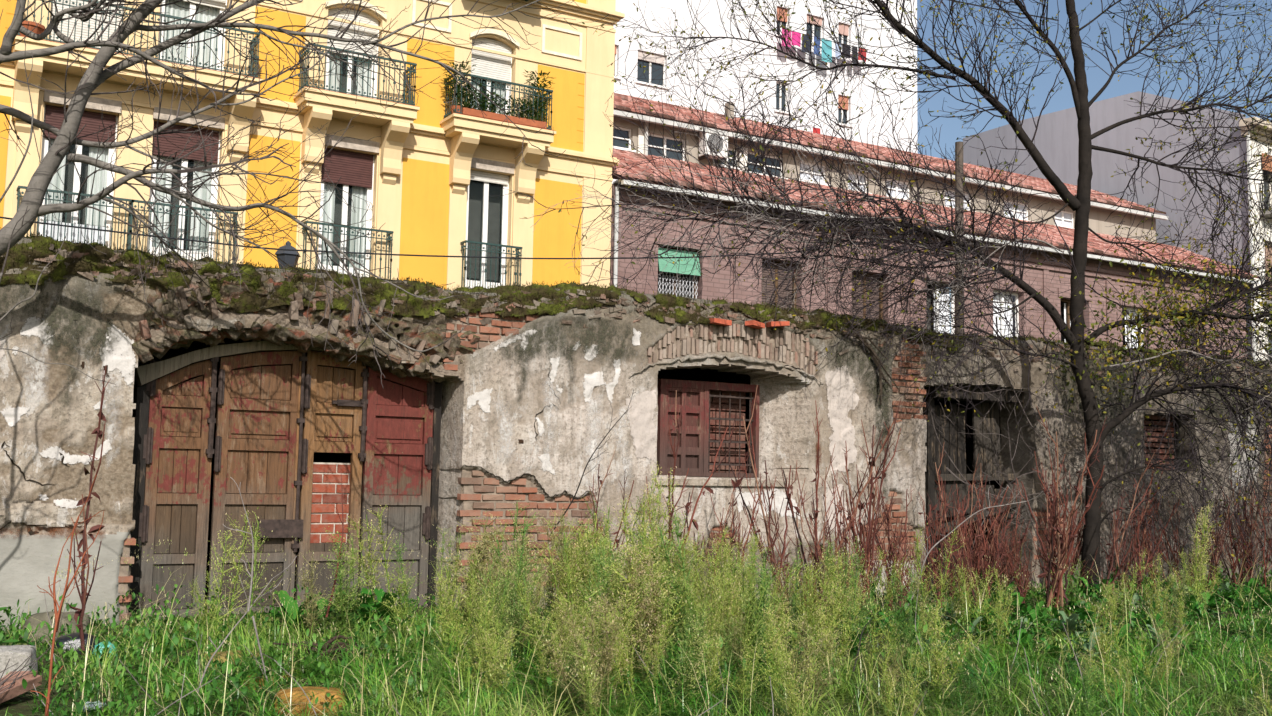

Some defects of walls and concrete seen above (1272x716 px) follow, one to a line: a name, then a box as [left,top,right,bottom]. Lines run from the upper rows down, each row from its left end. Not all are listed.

peeling [0,317,55,361]
spalling [99,278,546,385]
crack [1,441,70,486]
peeling [39,438,112,464]
peeling [538,453,555,475]
peeling [549,357,563,393]
peeling [572,340,657,462]
flaking render [632,324,860,532]
flaking render [892,338,928,424]
flaking render [455,469,611,587]
flaking render [864,491,922,561]